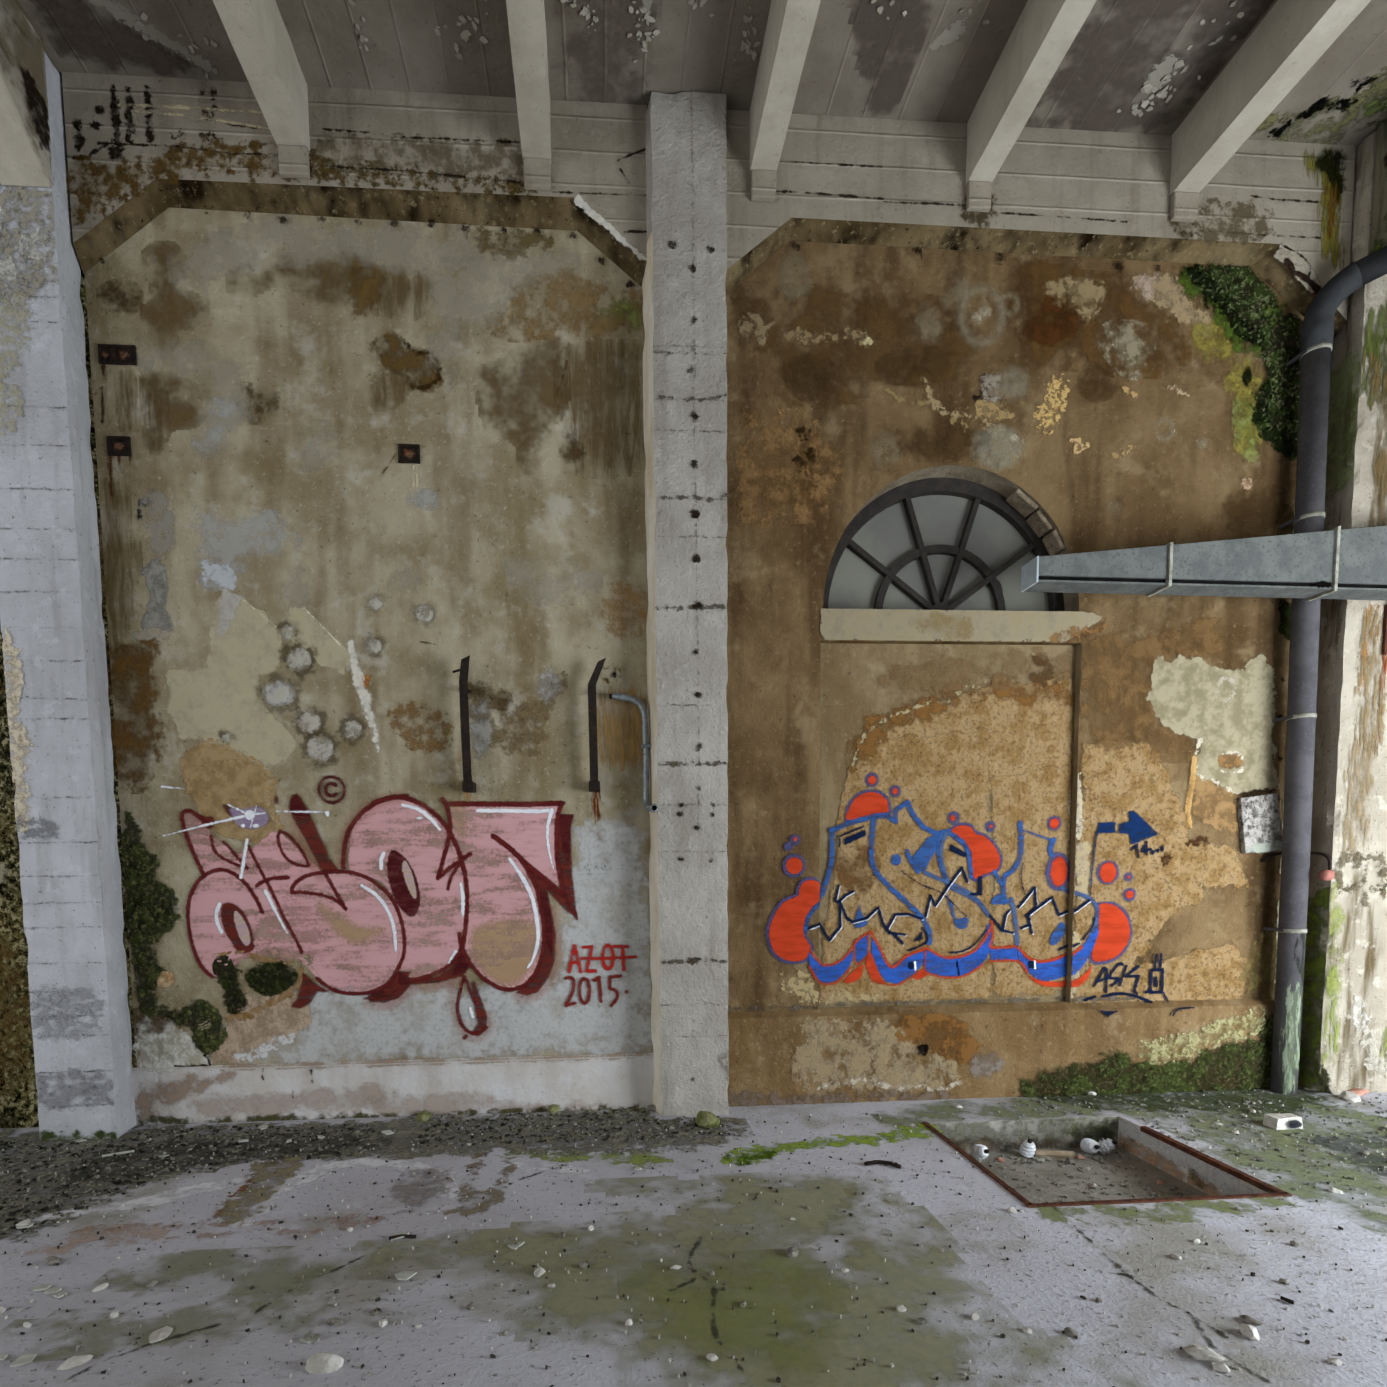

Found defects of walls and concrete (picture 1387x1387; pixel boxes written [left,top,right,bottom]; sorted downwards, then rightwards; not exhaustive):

peeling [87,0,217,79]
leakage [848,0,927,111]
peeling [1117,1,1244,118]
peeling [0,185,58,441]
leakage [98,242,198,330]
leakage [126,380,198,438]
leakage [372,334,444,401]
flaking render [131,492,175,641]
peeling [165,587,352,846]
corrosion [591,792,600,841]
flaking render [780,617,1249,1007]
leakage [0,938,114,1110]